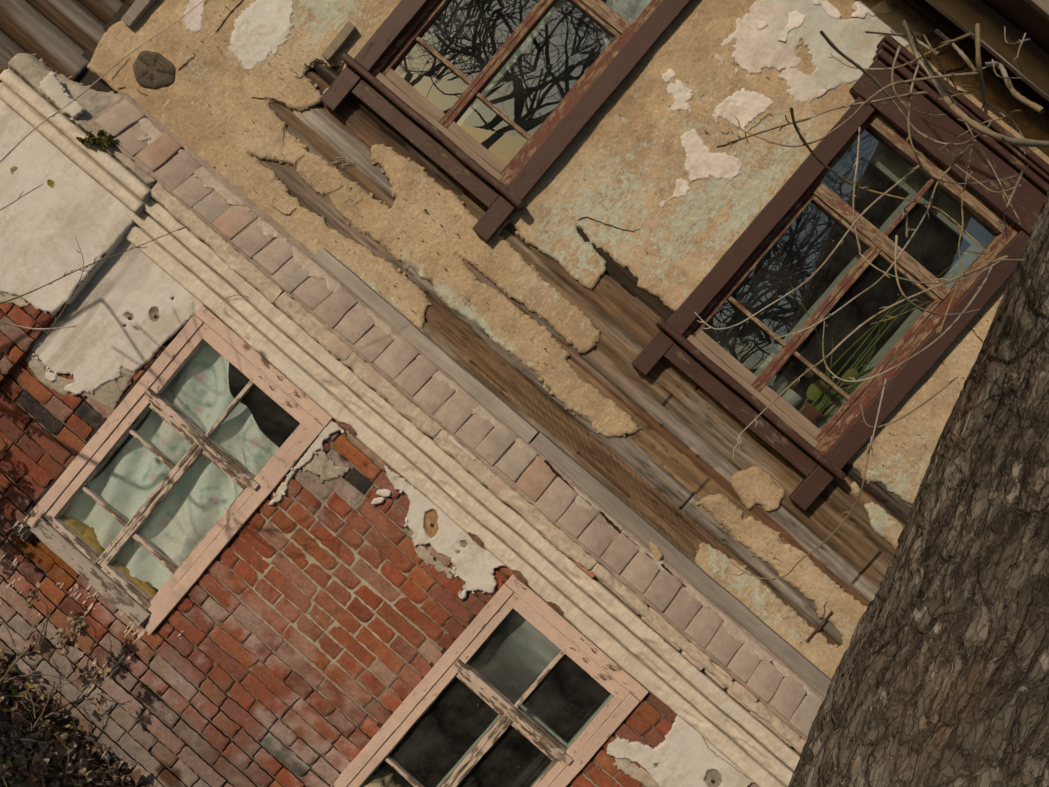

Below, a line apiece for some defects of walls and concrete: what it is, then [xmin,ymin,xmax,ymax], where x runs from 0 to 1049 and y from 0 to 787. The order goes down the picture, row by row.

flaking render [38,71,86,120]
peeling [228,0,295,70]
flaking render [270,62,488,221]
peeling [661,69,694,113]
peeling [659,129,743,208]
peeling [712,88,774,131]
peeling [714,0,932,104]
flaking render [0,99,205,396]
flaking render [150,155,912,752]
flaking render [606,715,755,787]